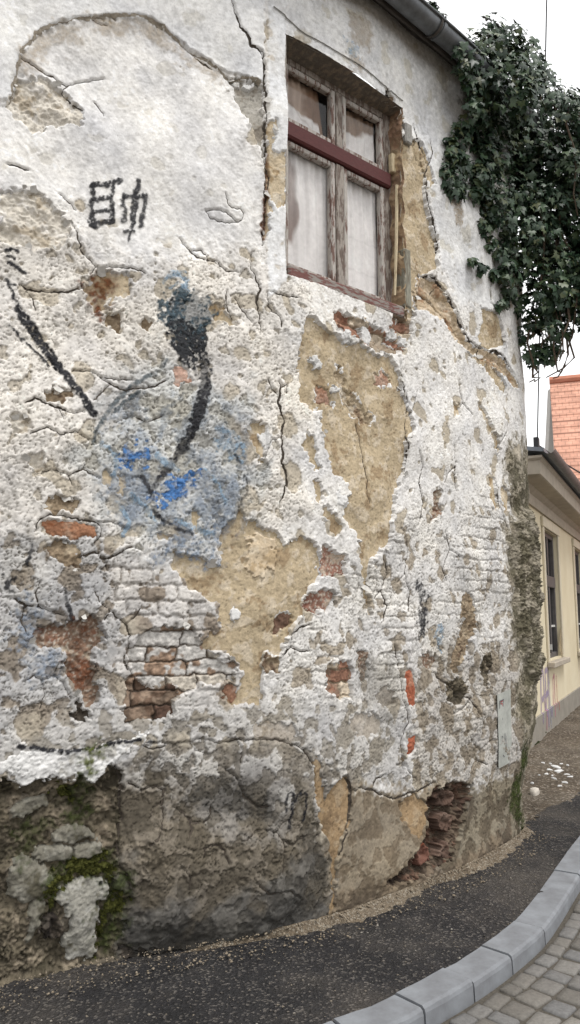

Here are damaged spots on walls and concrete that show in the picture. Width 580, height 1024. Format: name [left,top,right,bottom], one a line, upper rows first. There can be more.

spalling [6,12,286,241]
crack [184,3,298,331]
crack [21,195,146,310]
crack [265,380,288,507]
spalling [296,136,518,615]
flaking render [41,494,97,571]
spalling [29,615,105,708]
spalling [123,508,345,723]
spalling [449,592,482,673]
crack [339,646,433,855]
flaking render [5,823,130,961]
spalling [386,781,473,886]